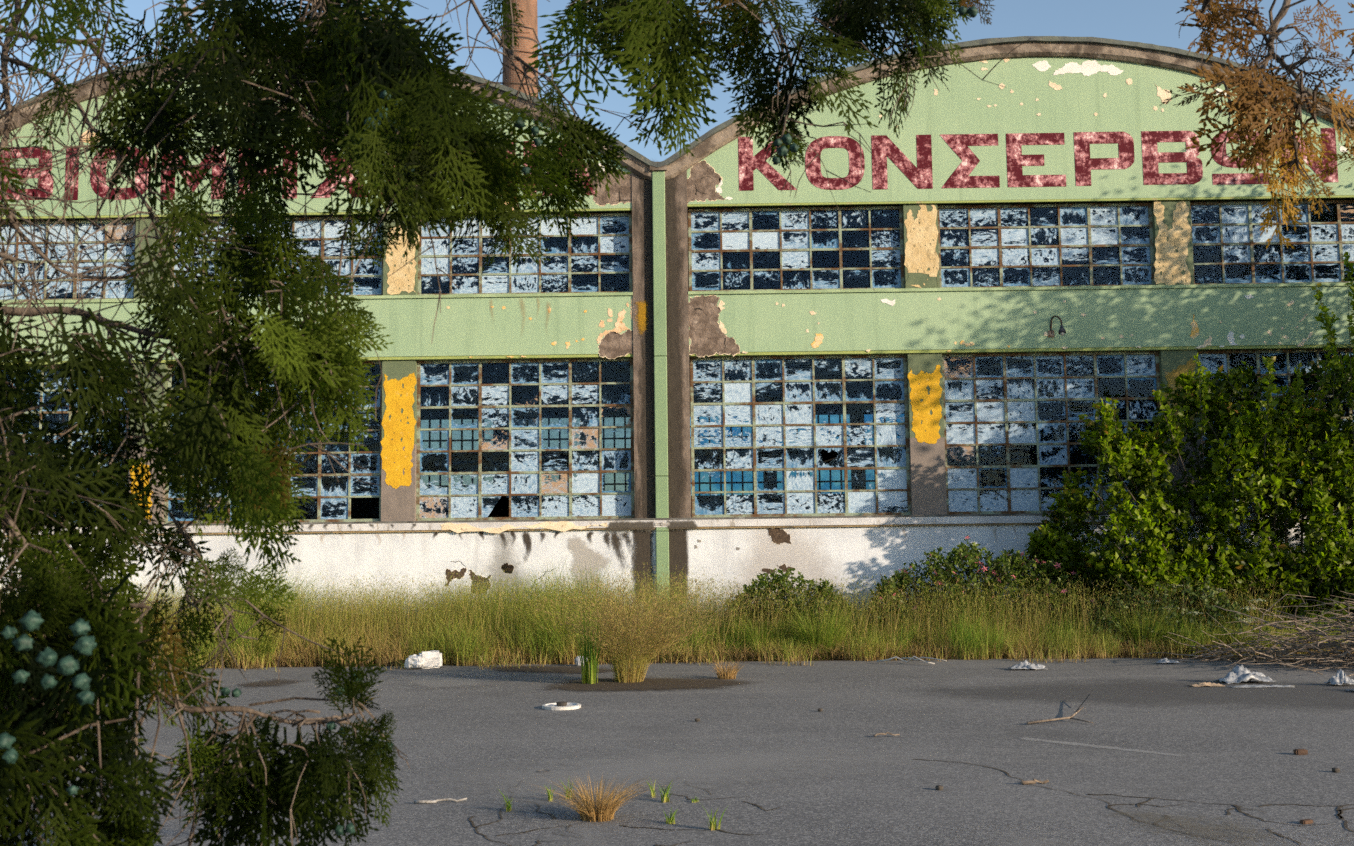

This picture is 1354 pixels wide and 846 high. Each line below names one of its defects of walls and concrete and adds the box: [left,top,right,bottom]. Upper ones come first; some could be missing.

peeling [1032,60,1133,90]
flaking render [687,160,733,204]
peeling [385,226,420,295]
peeling [904,204,939,288]
peeling [1153,201,1192,285]
flaking render [551,298,633,359]
flaking render [689,294,748,357]
peeling [908,340,975,444]
peeling [381,373,417,489]
water stain [493,532,559,594]
flaking render [761,563,796,575]
flaking render [768,528,793,545]